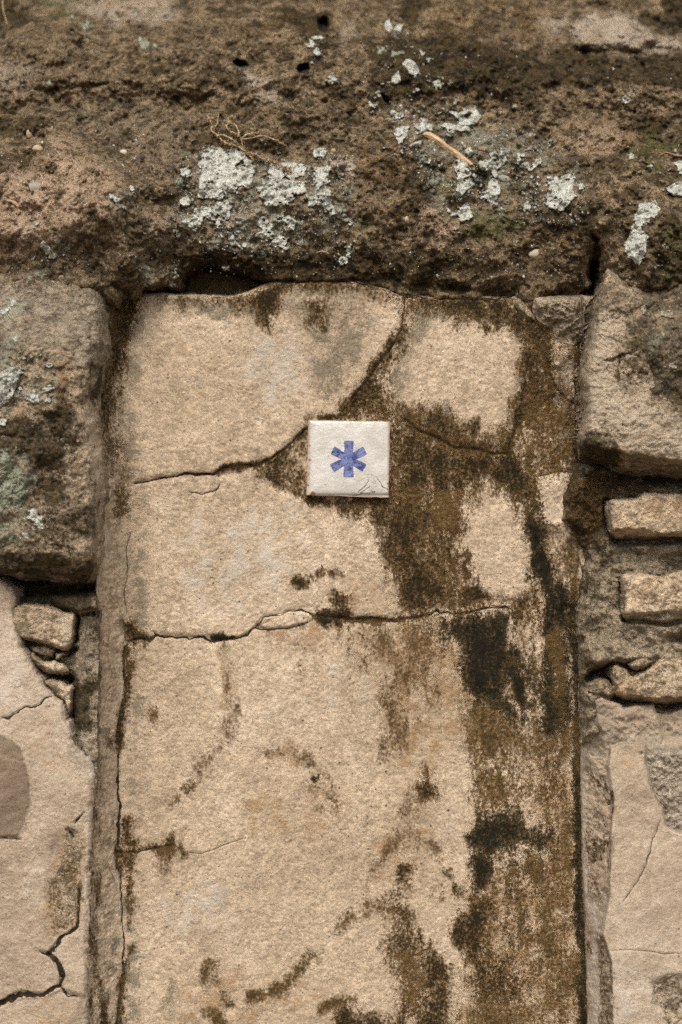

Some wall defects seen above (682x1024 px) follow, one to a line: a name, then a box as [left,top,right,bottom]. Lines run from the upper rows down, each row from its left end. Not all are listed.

crack [369,296,433,379]
damp [545,335,581,399]
crack [134,436,297,495]
damp [391,487,474,596]
crack [4,696,52,720]
damp [376,674,442,765]
crack [115,605,510,1024]
damp [412,761,439,802]
damp [493,600,614,1024]
crack [0,890,81,1006]
damp [389,951,426,1012]
damp [463,847,548,1009]